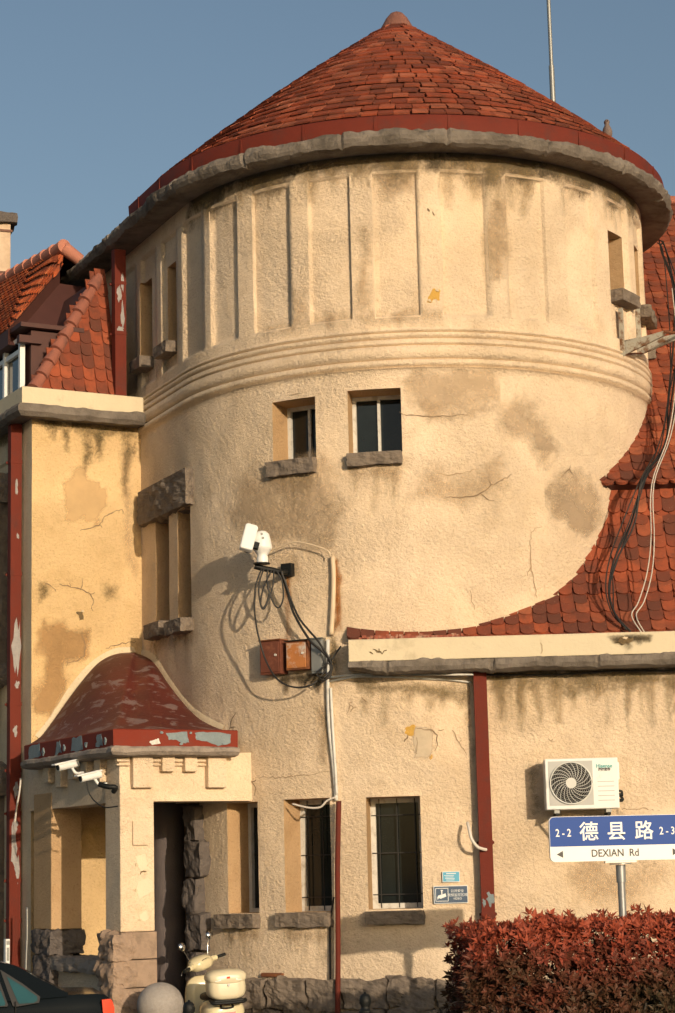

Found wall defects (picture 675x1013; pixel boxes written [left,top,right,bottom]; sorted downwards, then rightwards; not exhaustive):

leakage [188,153,635,219]
peeling [116,275,125,331]
leakage [44,420,134,477]
crack [440,469,511,501]
crack [45,580,95,611]
peeling [11,618,21,688]
crack [65,636,136,666]
leakage [492,668,675,695]
peeling [150,731,231,746]
peeling [402,724,416,736]